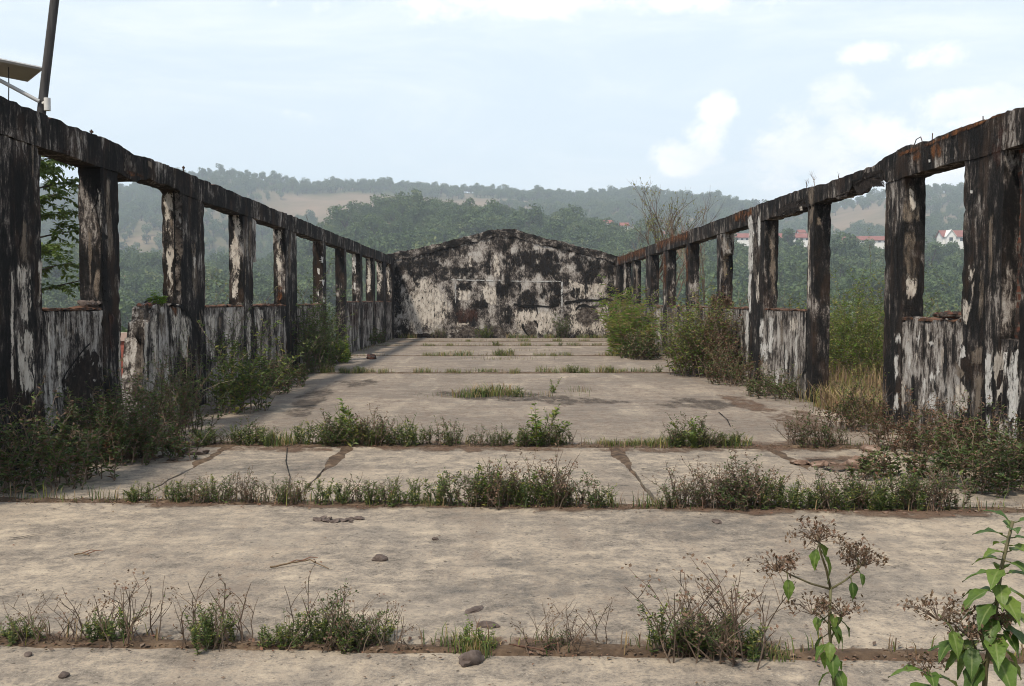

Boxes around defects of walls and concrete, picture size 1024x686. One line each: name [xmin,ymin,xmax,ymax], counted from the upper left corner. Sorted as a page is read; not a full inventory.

peeling [10,221,35,394]
spalling [57,303,191,415]
flaking render [163,191,184,297]
peeling [208,215,263,362]
damp [394,249,615,324]
peeling [740,215,802,389]
peeling [903,188,919,299]
peeling [893,331,1019,456]
damp [963,217,993,325]